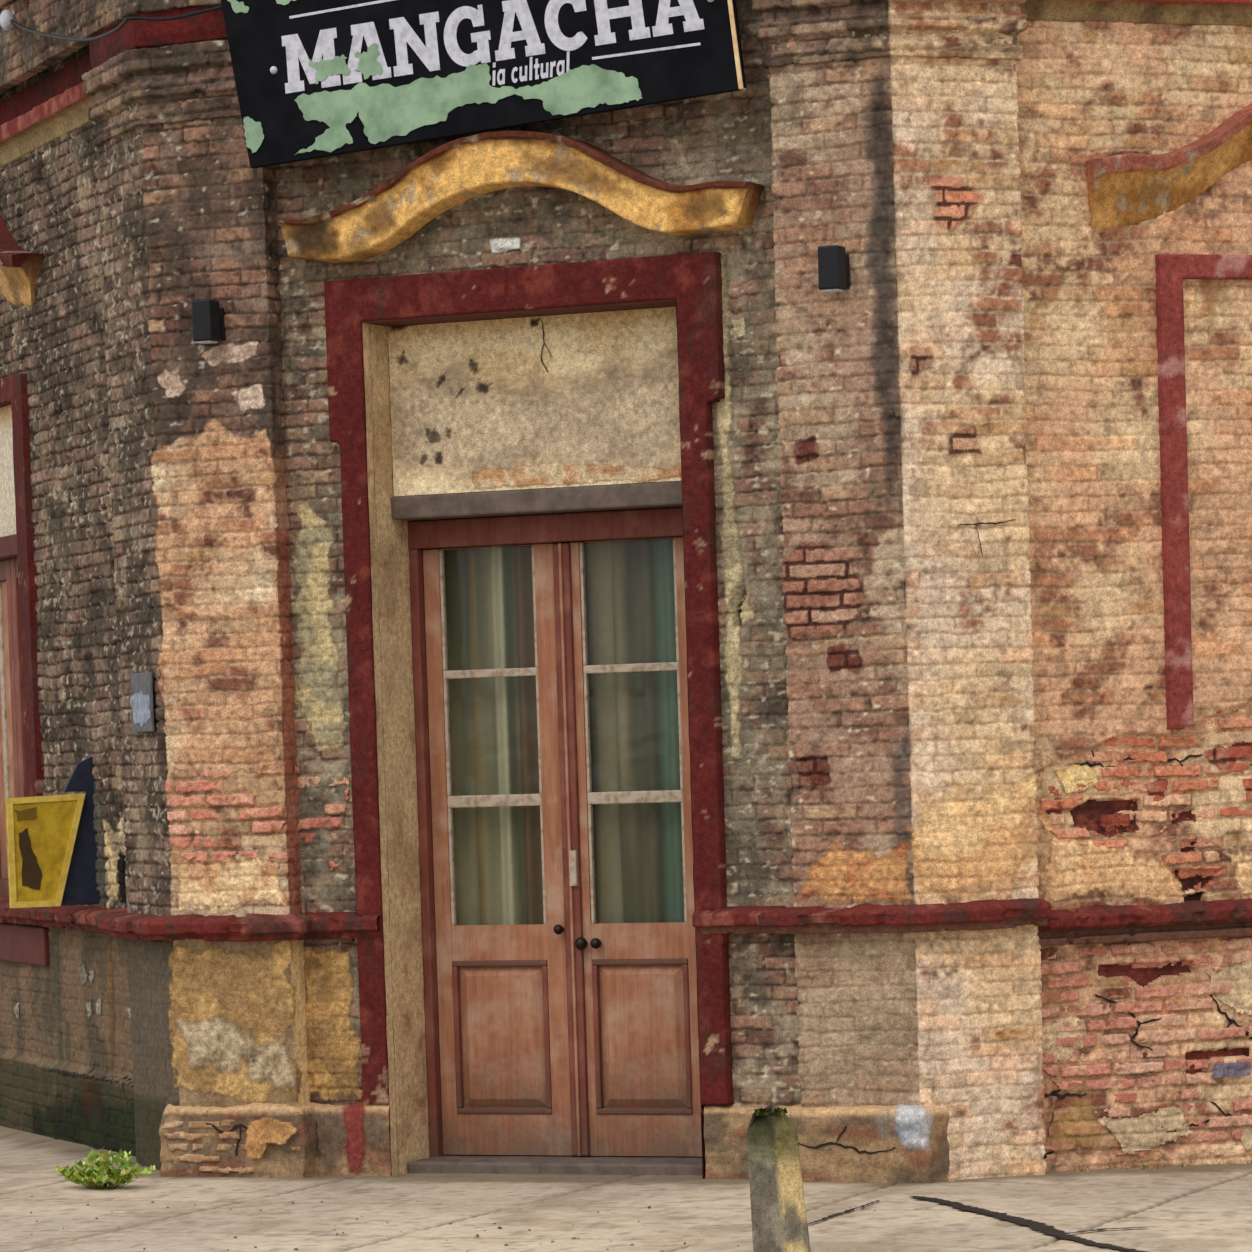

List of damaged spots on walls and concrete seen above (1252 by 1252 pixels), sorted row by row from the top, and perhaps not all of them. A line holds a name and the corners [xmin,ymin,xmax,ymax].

crack [540,319,552,372]
flaking render [793,435,819,464]
flaking render [782,541,866,674]
flaking render [794,709,1252,905]
flaking render [77,963,94,985]
flaking render [86,998,101,1018]
crack [1095,994,1162,1051]
crack [1210,994,1252,1039]
flaking render [168,940,363,1159]
crack [1167,1101,1232,1133]
crack [798,1126,895,1154]